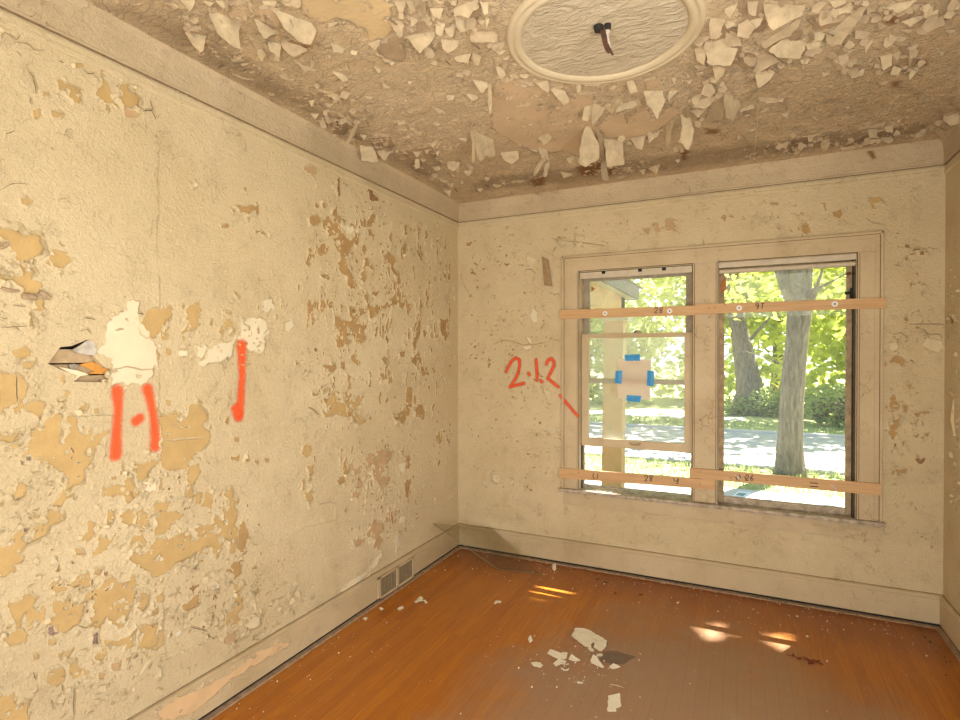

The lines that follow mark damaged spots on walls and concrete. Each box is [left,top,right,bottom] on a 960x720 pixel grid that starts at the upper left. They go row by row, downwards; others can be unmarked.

peeling [166,0,960,198]
peeling [0,164,555,720]
peeling [883,232,960,511]